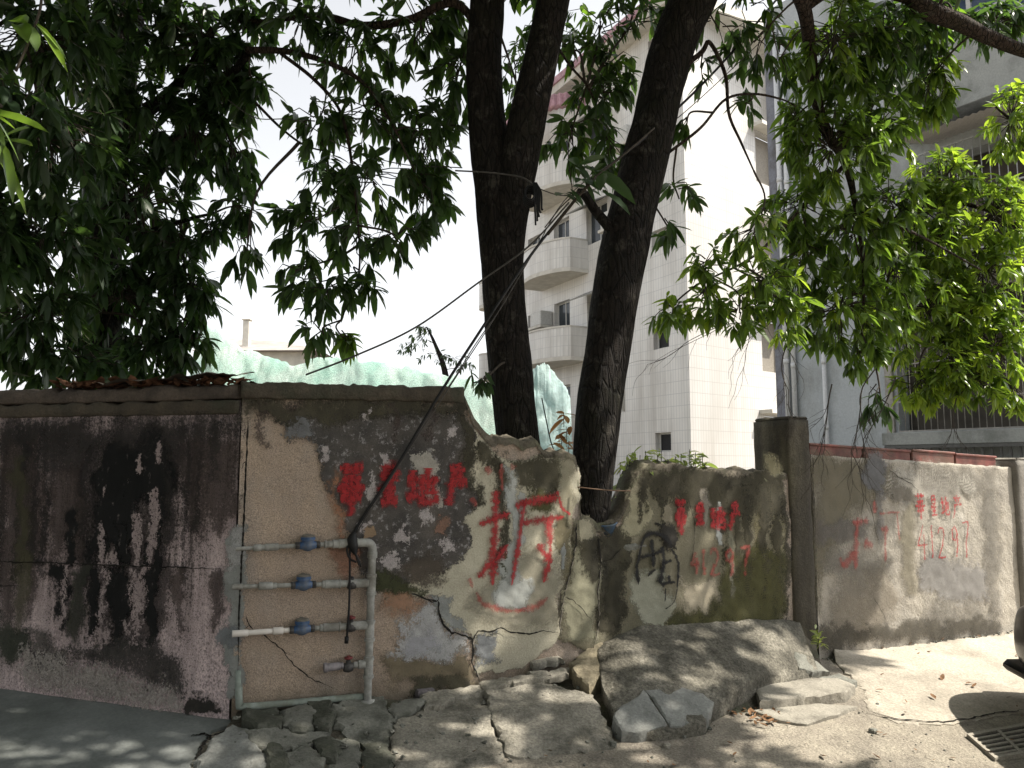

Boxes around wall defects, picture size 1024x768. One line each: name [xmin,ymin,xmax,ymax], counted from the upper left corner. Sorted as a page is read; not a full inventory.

crack [0,427,334,689]
water stain [0,397,633,713]
spalling [356,520,376,538]
crack [411,523,620,680]
water stain [665,606,740,626]
water stain [637,463,793,620]